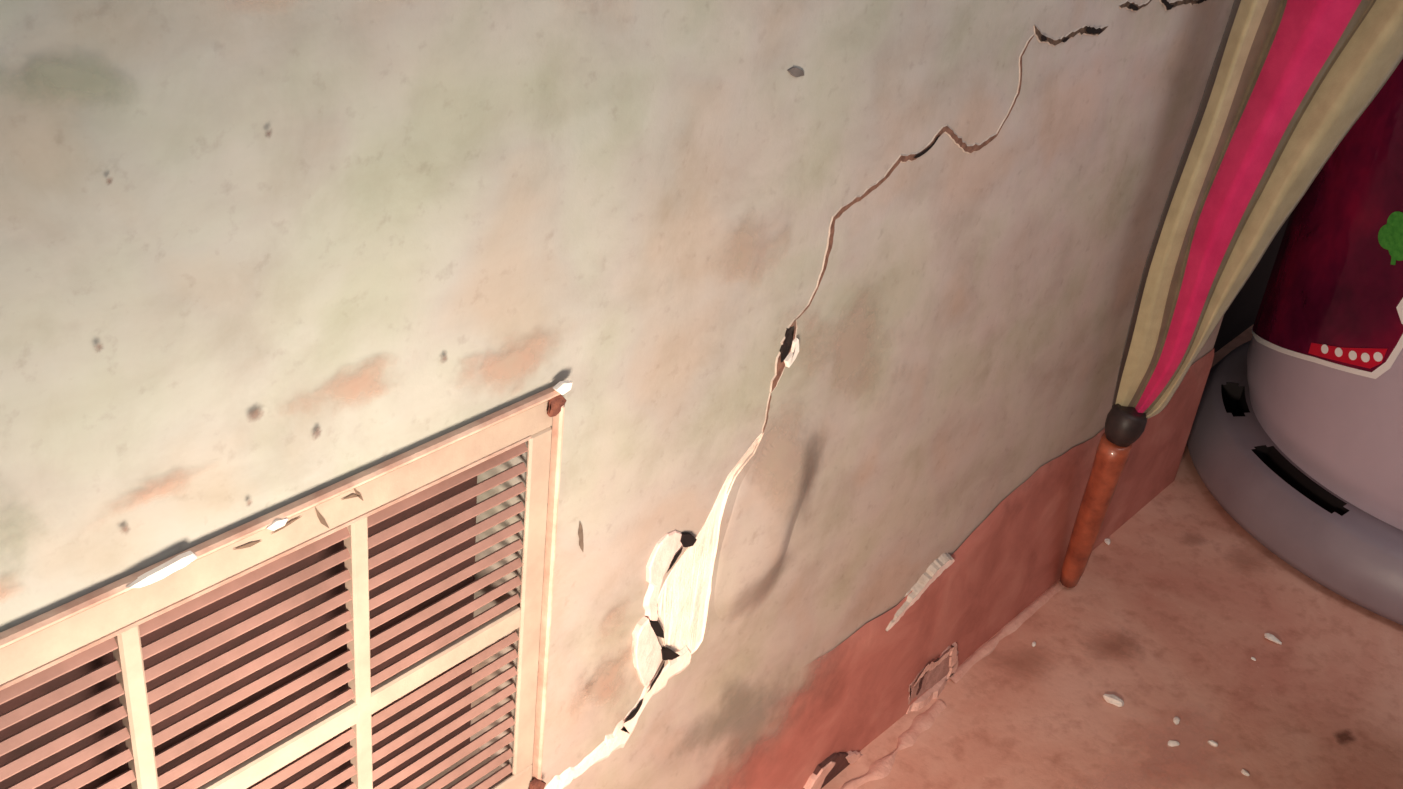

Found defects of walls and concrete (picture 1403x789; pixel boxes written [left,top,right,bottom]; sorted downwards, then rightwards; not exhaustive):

crack [762,0,1207,433]
spalling [126,551,197,588]
spalling [631,433,764,693]
spalling [886,553,955,631]
spalling [906,642,959,714]
crack [545,646,691,789]
spalling [803,750,862,789]